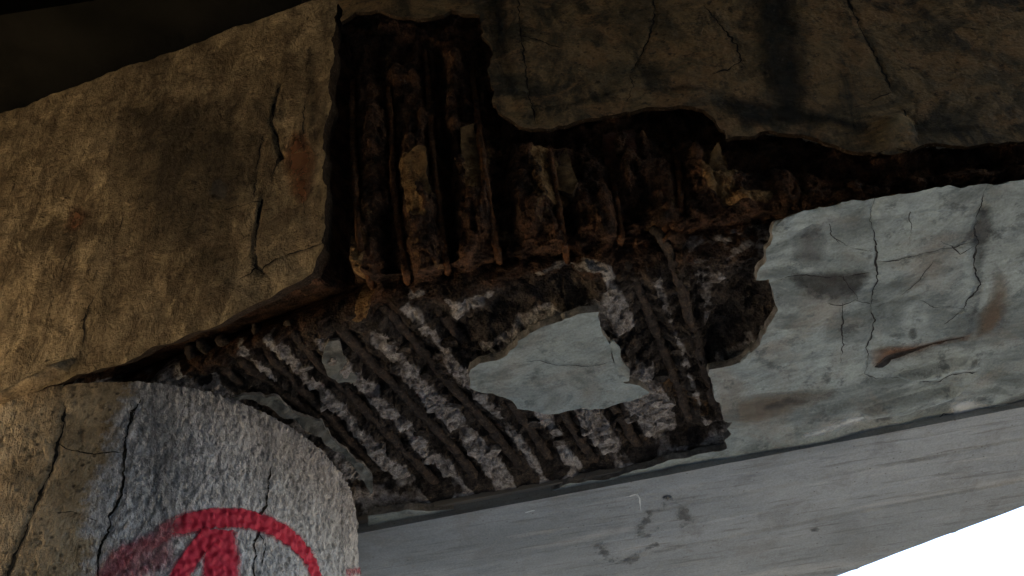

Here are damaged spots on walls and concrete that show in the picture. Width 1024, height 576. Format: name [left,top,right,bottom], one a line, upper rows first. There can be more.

crack [841,0,920,142]
crack [230,85,322,279]
spalling [63,13,775,517]
spalling [680,109,1024,271]
crack [827,183,989,382]
crack [7,400,141,576]